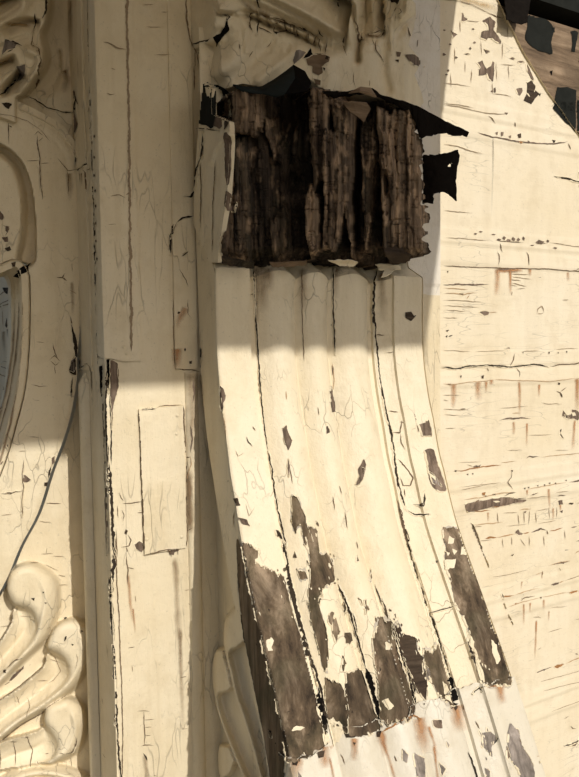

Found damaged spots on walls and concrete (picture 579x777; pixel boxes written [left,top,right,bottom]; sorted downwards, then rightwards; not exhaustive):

crack [185,0,388,89]
peeling [443,11,501,92]
spalling [510,56,541,104]
crack [1,0,152,367]
crack [167,94,232,285]
peeling [199,82,238,213]
crack [330,268,338,389]
crack [443,347,579,385]
peeling [465,492,549,513]
peeling [233,494,456,777]
peeling [441,526,513,689]
peeling [468,722,535,777]